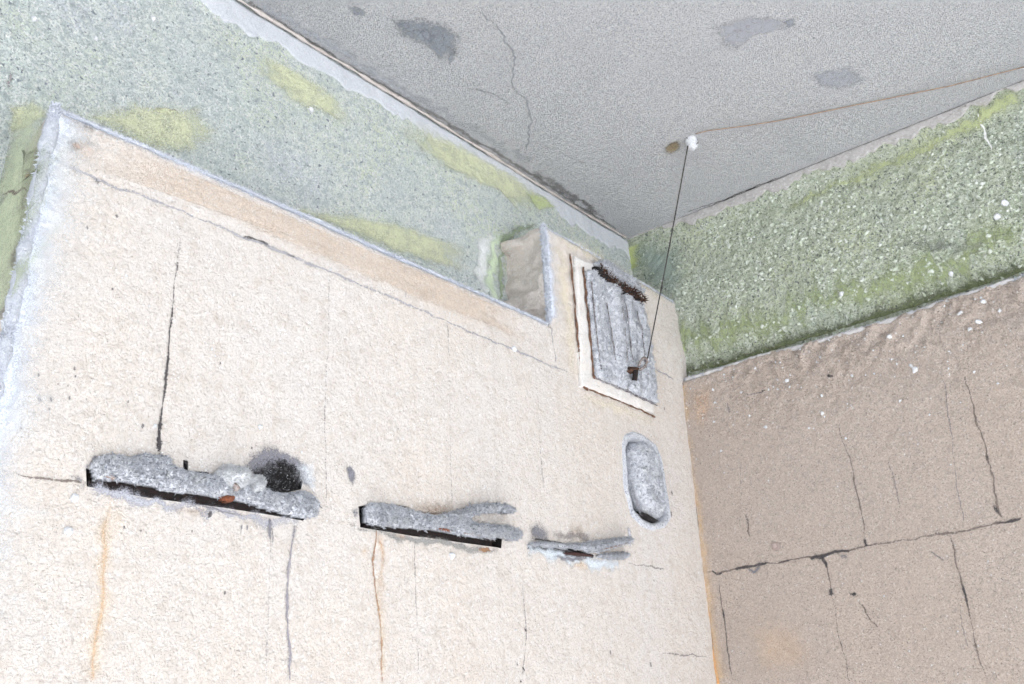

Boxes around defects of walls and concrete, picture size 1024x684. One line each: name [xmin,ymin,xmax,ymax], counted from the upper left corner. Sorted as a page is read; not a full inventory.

leakage [249,1,608,224]
crack [476,13,533,147]
crack [64,164,567,498]
corrosion [569,254,658,418]
leakage [679,227,1014,351]
corrosion [372,530,383,680]
crack [667,377,1021,677]